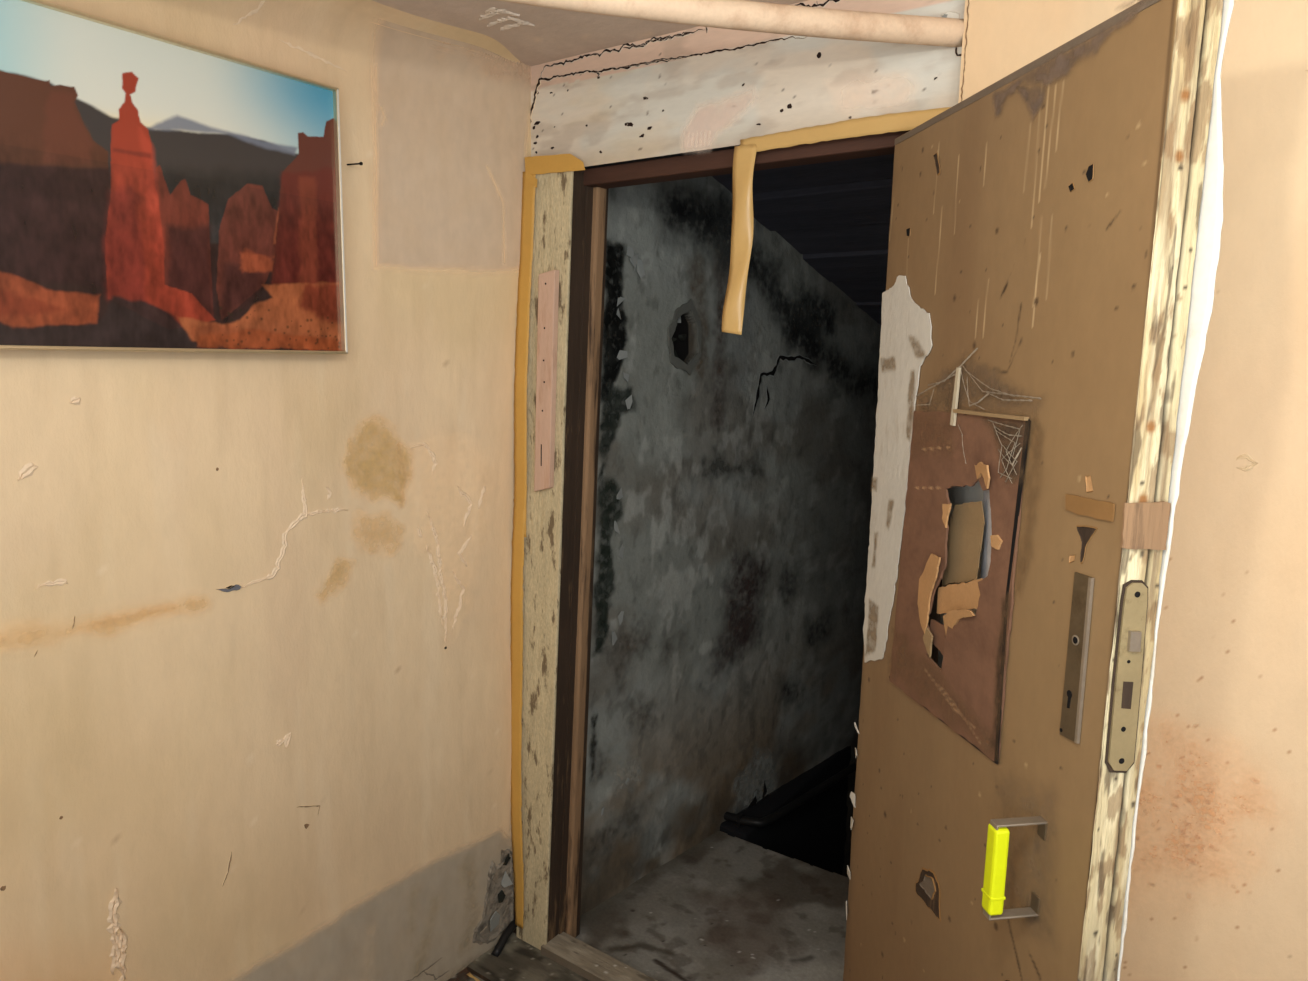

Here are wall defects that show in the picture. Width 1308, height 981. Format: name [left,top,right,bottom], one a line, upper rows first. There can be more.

crack [530,0,841,124]
crack [955,0,970,102]
water stain [691,192,732,425]
water stain [346,422,410,502]